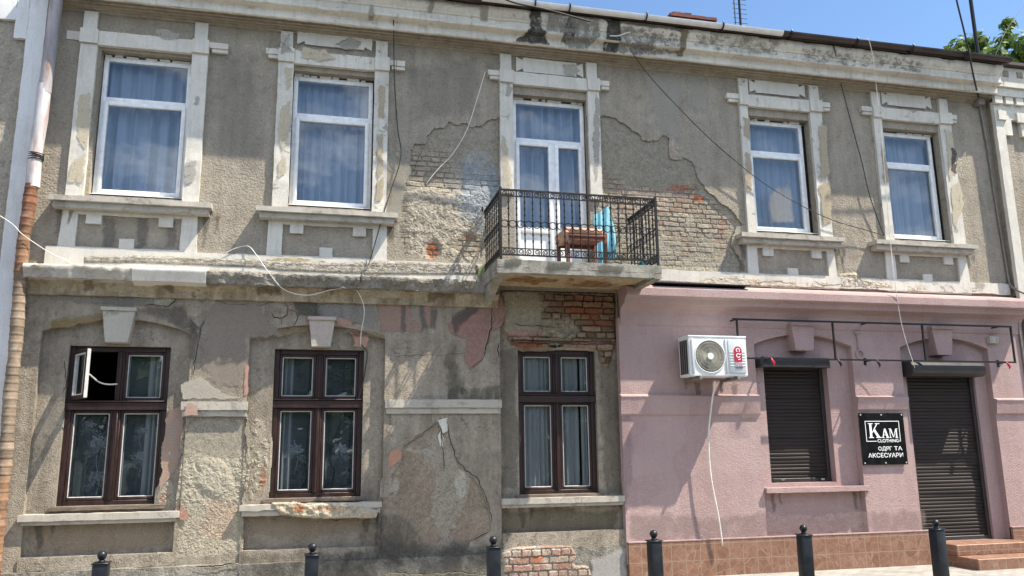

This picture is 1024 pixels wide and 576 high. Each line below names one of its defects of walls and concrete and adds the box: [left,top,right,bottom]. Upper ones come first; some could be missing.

leakage [516,10,683,55]
peeling [68,93,91,184]
spalling [400,117,512,261]
spalling [592,95,828,289]
peeling [818,125,832,225]
peeling [944,129,964,228]
crack [145,299,298,376]
flaking render [448,290,616,370]
spalling [159,365,250,556]
crack [378,419,492,576]
flaking render [501,545,592,576]